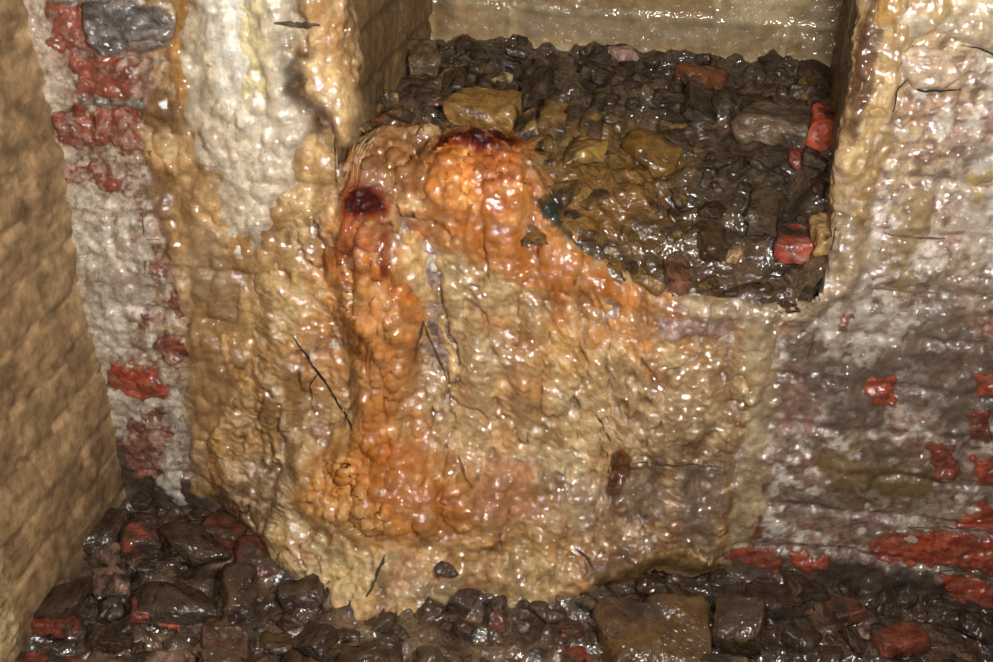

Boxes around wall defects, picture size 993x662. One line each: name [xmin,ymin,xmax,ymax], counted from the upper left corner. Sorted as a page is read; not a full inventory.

spalling [44,0,175,193]
crack [892,79,961,112]
leakage [67,190,153,363]
rust [324,126,521,324]
leakage [116,0,914,621]
leakage [953,147,993,259]
crack [292,333,353,431]
spalling [965,373,993,444]
leakage [819,459,932,502]
spalling [925,442,993,486]
leakage [793,563,993,610]
spalling [869,501,993,609]